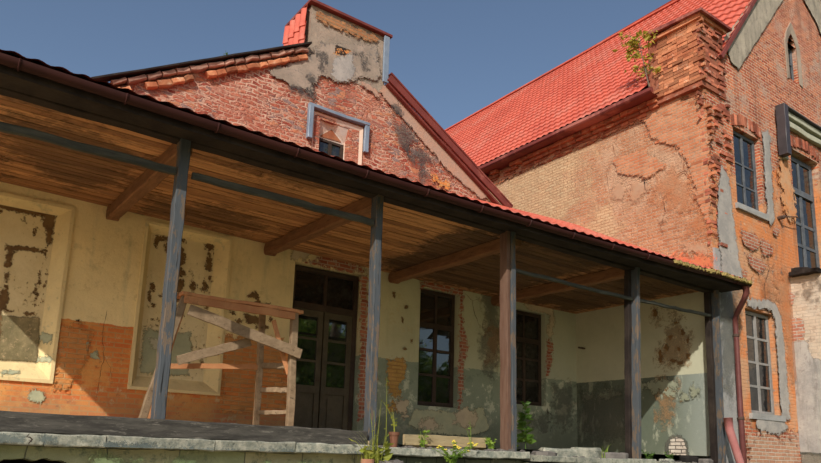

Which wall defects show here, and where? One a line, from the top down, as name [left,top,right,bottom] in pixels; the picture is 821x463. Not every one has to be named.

flaking render [316,9,380,42]
spalling [333,45,351,57]
peeling [0,205,57,316]
peeling [153,235,168,254]
peeling [177,239,214,293]
flaking render [305,257,369,422]
peeling [387,281,491,437]
peeling [658,321,690,366]
flaking render [790,316,805,342]